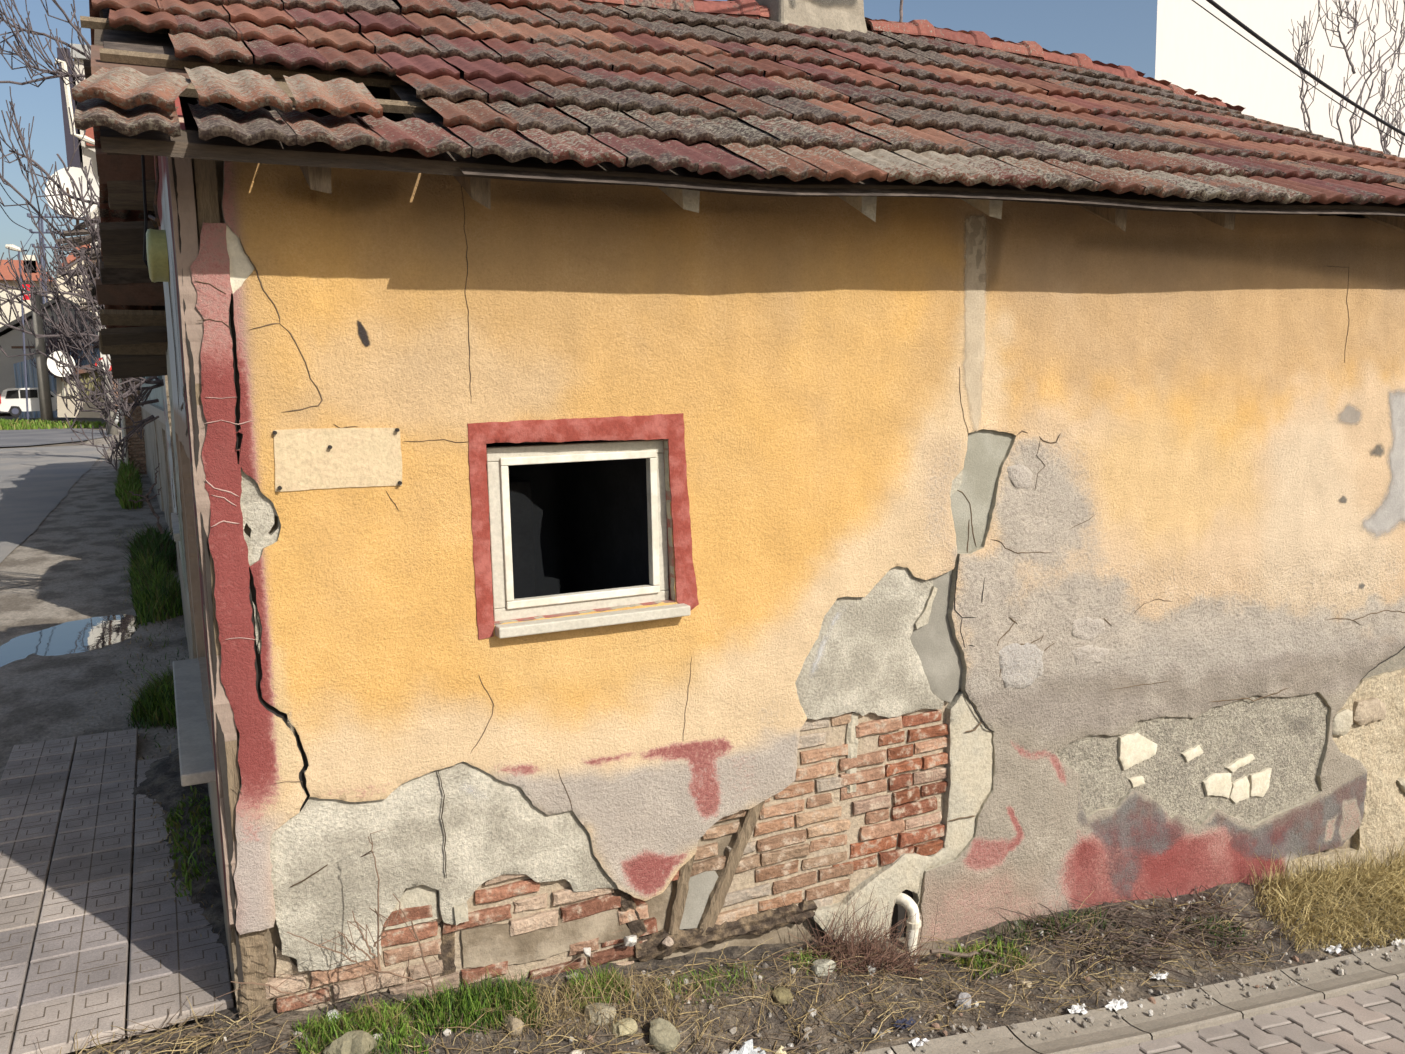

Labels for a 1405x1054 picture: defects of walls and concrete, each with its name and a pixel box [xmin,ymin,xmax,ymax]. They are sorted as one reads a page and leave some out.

flaking render [240,468,281,565]
crack [168,157,357,985]
flaking render [950,429,1013,553]
peeling [1363,391,1405,536]
spalling [1363,648,1405,679]
flaking render [795,566,993,945]
flaking render [1054,692,1328,825]
flaking render [270,761,618,972]